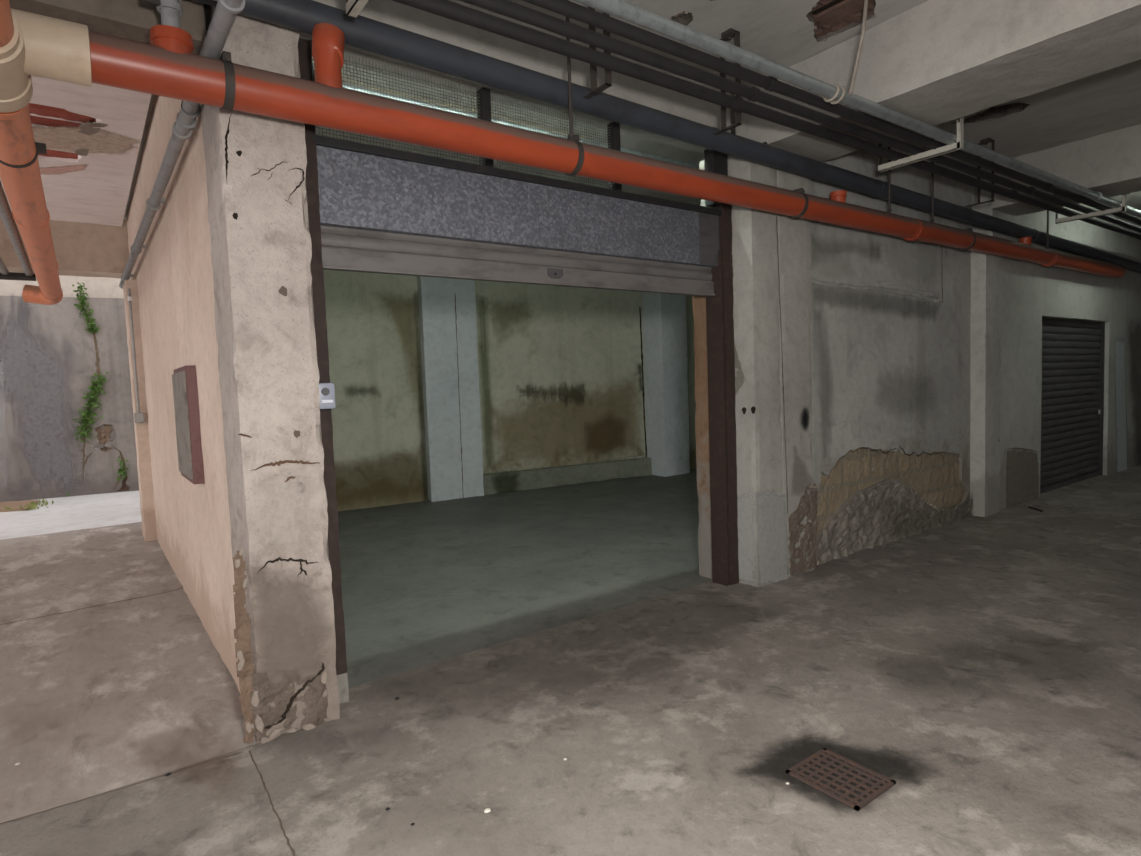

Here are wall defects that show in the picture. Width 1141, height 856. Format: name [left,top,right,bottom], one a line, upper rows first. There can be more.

spalling [810,0,876,41]
peeling [29,103,137,174]
crack [225,116,305,205]
damp [481,320,491,465]
damp [524,384,584,403]
crack [251,460,320,482]
damp [494,473,518,494]
peeling [787,448,965,576]
crack [258,557,319,577]
spalling [233,548,328,744]
crack [0,663,325,856]